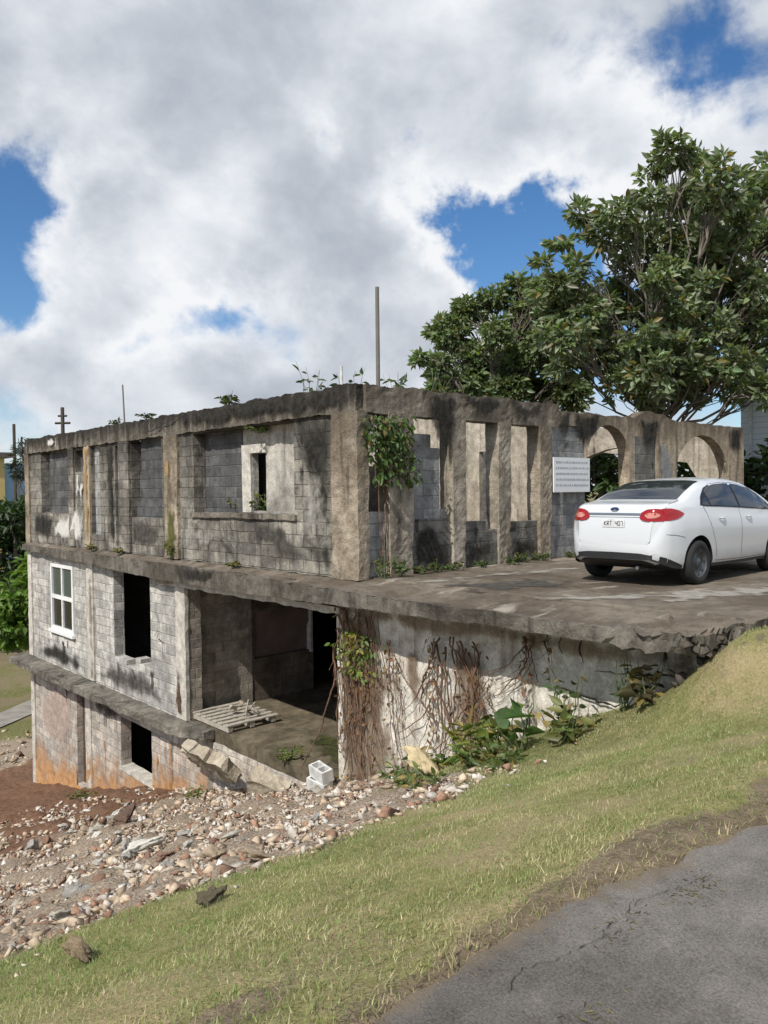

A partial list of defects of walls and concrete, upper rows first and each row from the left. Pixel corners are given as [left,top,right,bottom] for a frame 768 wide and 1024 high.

leakage [180,390,337,424]
leakage [300,427,328,522]
spalling [667,629,735,688]